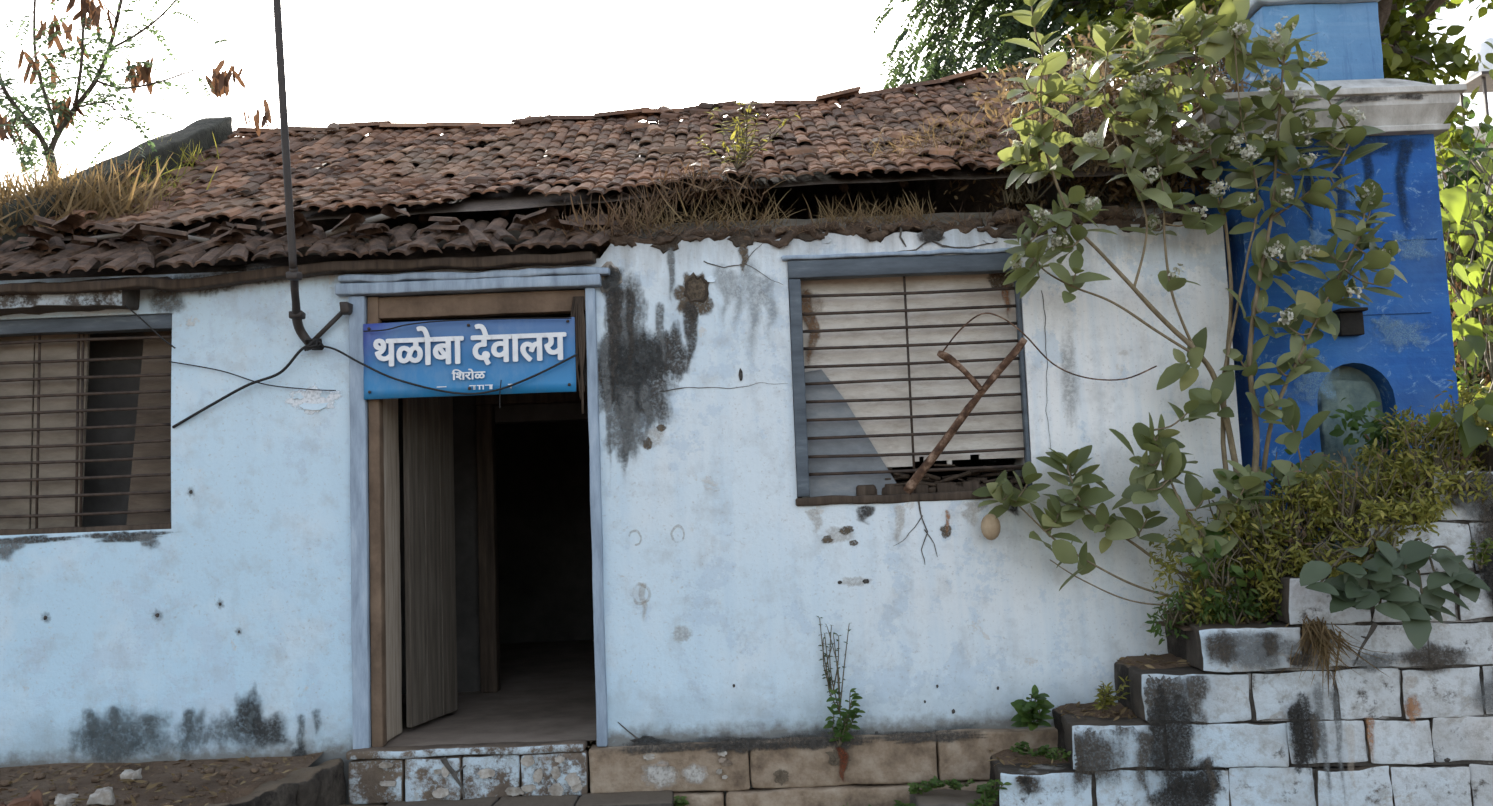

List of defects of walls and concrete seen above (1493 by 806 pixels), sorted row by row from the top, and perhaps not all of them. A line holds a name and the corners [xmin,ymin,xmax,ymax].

damp [584,267,686,461]
flaking render [650,230,716,368]
damp [0,531,166,559]
damp [1451,471,1493,604]
damp [82,707,164,756]
damp [181,690,319,756]
damp [1074,631,1297,806]
damp [1287,684,1343,784]